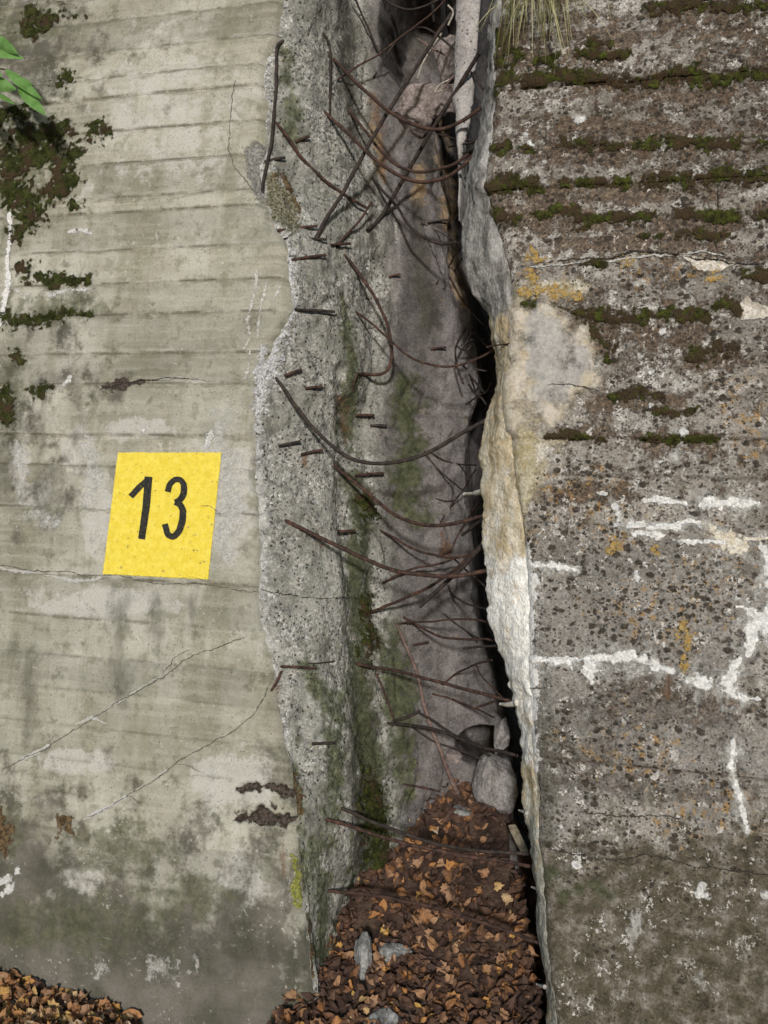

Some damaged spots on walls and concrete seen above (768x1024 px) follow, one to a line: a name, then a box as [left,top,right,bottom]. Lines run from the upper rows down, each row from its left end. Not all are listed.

crack [519,182,765,268]
spalling [101,377,145,393]
spalling [244,0,557,1024]
crack [5,638,241,768]
crack [0,565,358,599]
crack [84,684,298,820]
spalling [234,782,298,829]
damp [525,546,676,774]
damp [597,490,768,711]
damp [726,738,750,834]